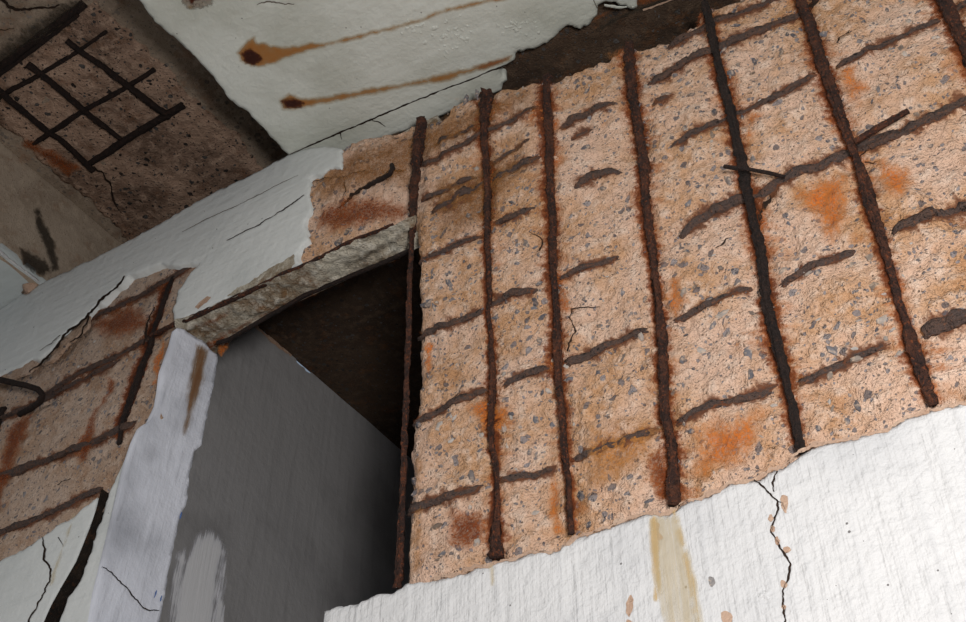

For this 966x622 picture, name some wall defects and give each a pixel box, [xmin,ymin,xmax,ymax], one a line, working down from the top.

spalling [0,0,263,241]
corrosion [238,0,498,66]
corrosion [281,58,506,109]
corrosion [317,91,526,230]
crack [593,0,671,29]
crack [809,0,819,13]
spalling [175,0,966,589]
spalling [0,267,196,561]
corrosion [184,336,228,431]
crack [27,488,159,622]
corrosion [651,516,660,600]
crack [754,471,792,622]